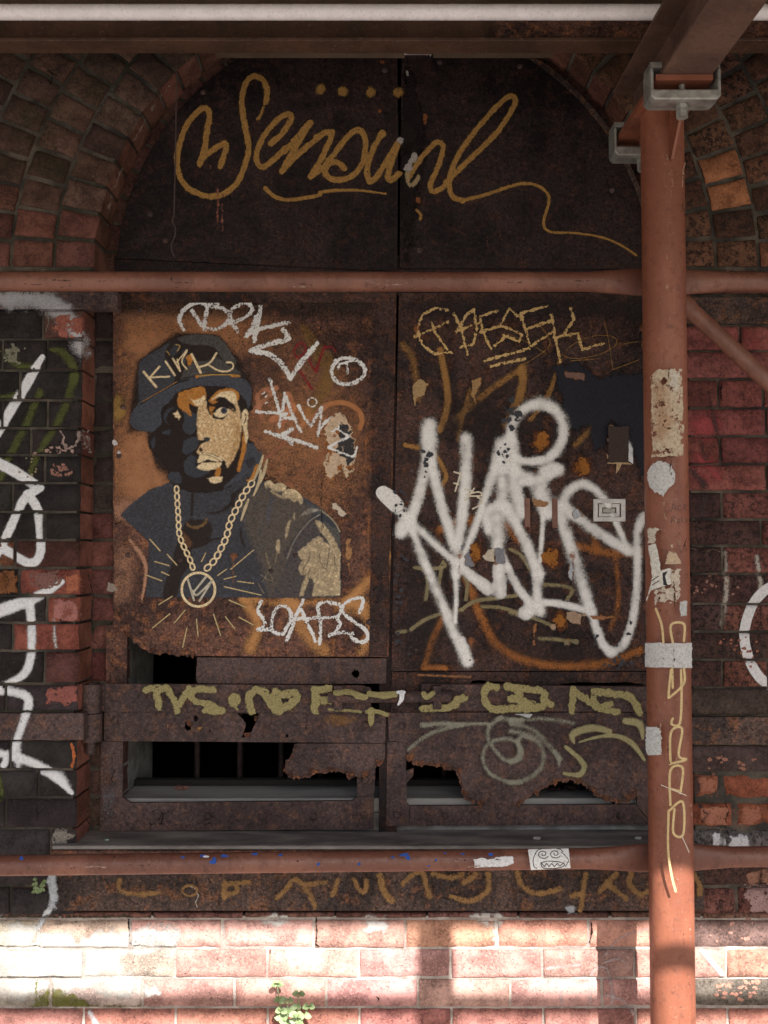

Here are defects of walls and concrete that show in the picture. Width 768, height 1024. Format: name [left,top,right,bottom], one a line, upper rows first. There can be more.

corrosion [113,305,370,525]
corrosion [437,347,528,442]
corrosion [528,358,562,452]
corrosion [573,427,592,476]
corrosion [114,539,148,609]
corrosion [239,570,371,657]
corrosion [417,607,471,678]
corrosion [435,514,481,535]
corrosion [501,519,521,544]
corrosion [458,542,644,671]
corrosion [541,522,644,632]